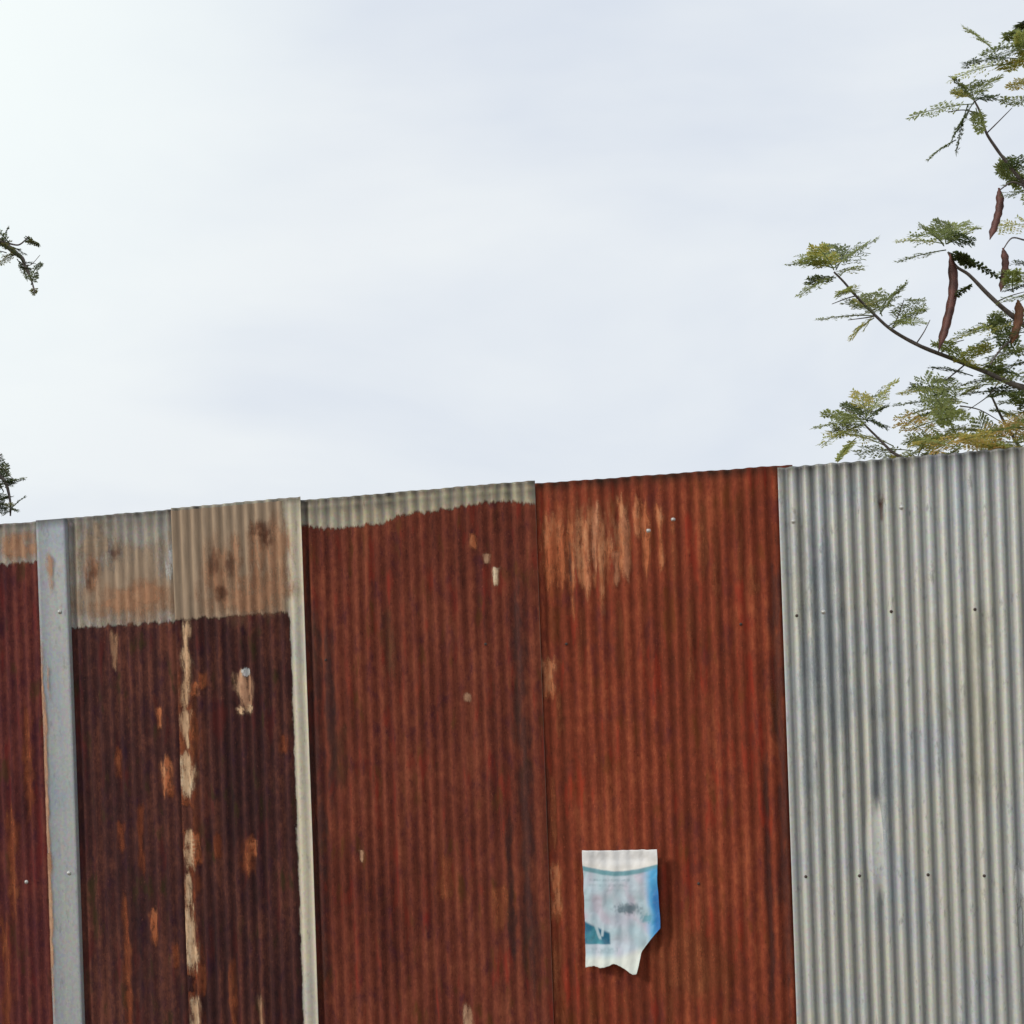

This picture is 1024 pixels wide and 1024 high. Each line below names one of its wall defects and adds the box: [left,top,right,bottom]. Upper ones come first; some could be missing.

rust [0,533,54,1024]
rust [71,496,695,1024]
rust [650,909,731,1024]